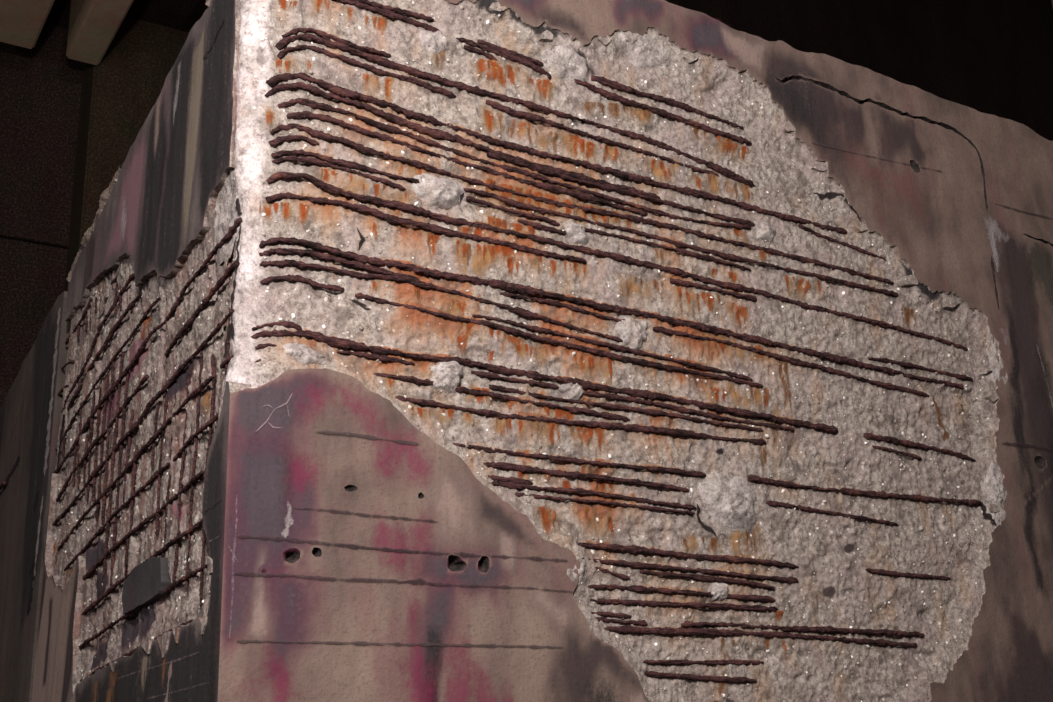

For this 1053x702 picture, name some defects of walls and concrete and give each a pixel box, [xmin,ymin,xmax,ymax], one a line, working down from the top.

water stain [107,0,234,272]
corrosion [456,216,535,276]
corrosion [483,108,620,162]
corrosion [486,176,631,227]
crack [814,192,862,222]
crack [776,75,988,213]
crack [1024,234,1053,247]
spalling [55,212,217,470]
spalling [471,371,563,389]
water stain [987,220,1053,589]
spalling [52,359,218,683]
water stain [418,501,523,702]